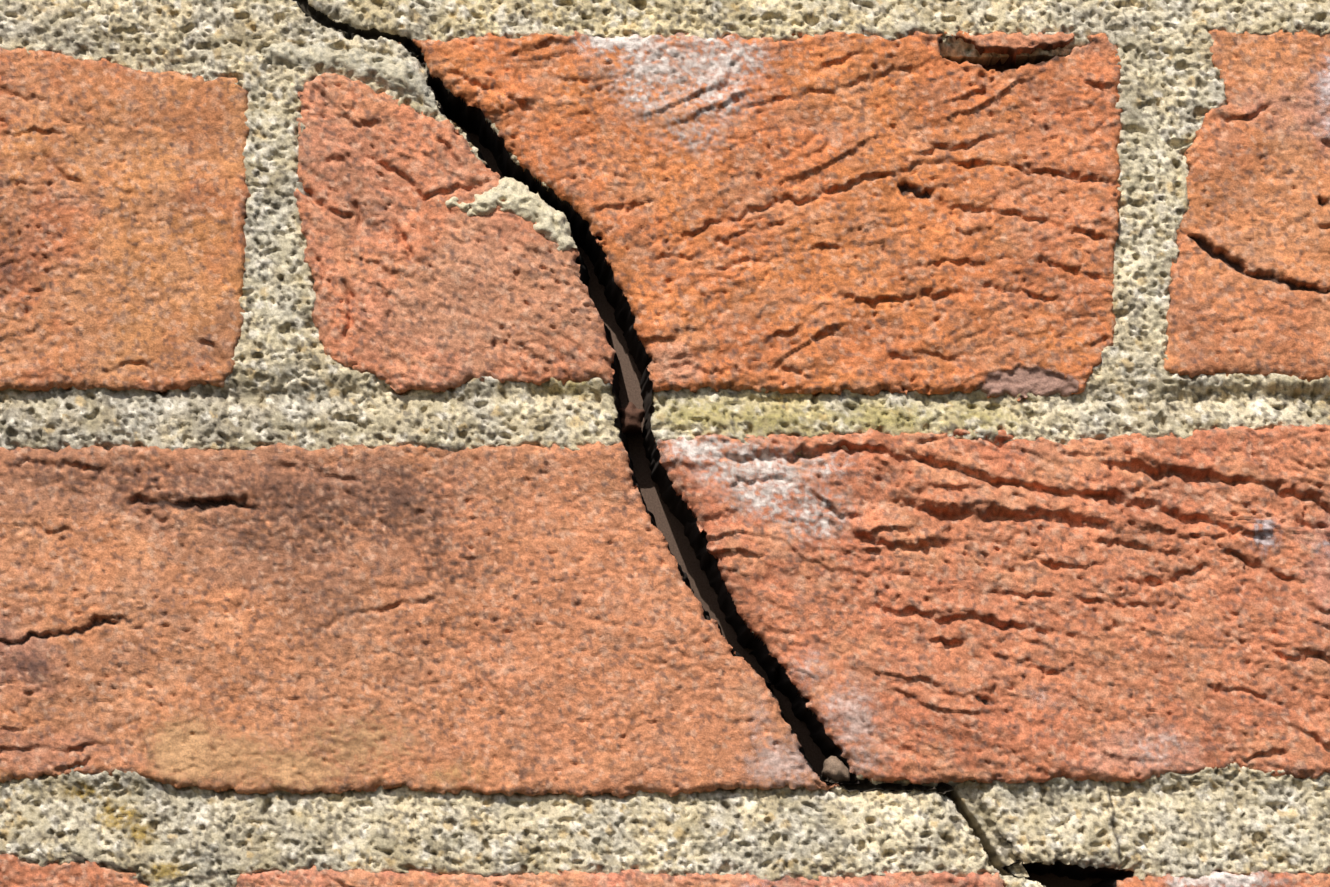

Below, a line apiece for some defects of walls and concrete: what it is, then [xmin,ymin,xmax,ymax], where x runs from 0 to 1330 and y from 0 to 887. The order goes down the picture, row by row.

crack [293,0,1134,887]